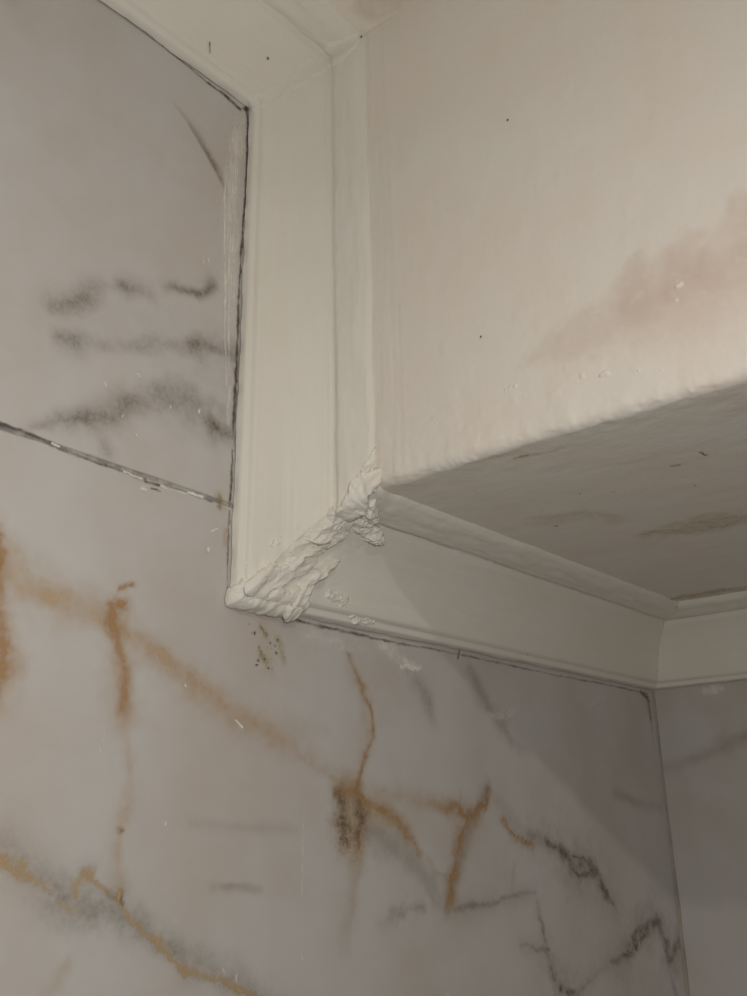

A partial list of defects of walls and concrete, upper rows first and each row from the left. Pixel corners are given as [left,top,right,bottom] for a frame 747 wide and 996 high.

peeling [352,499,385,546]